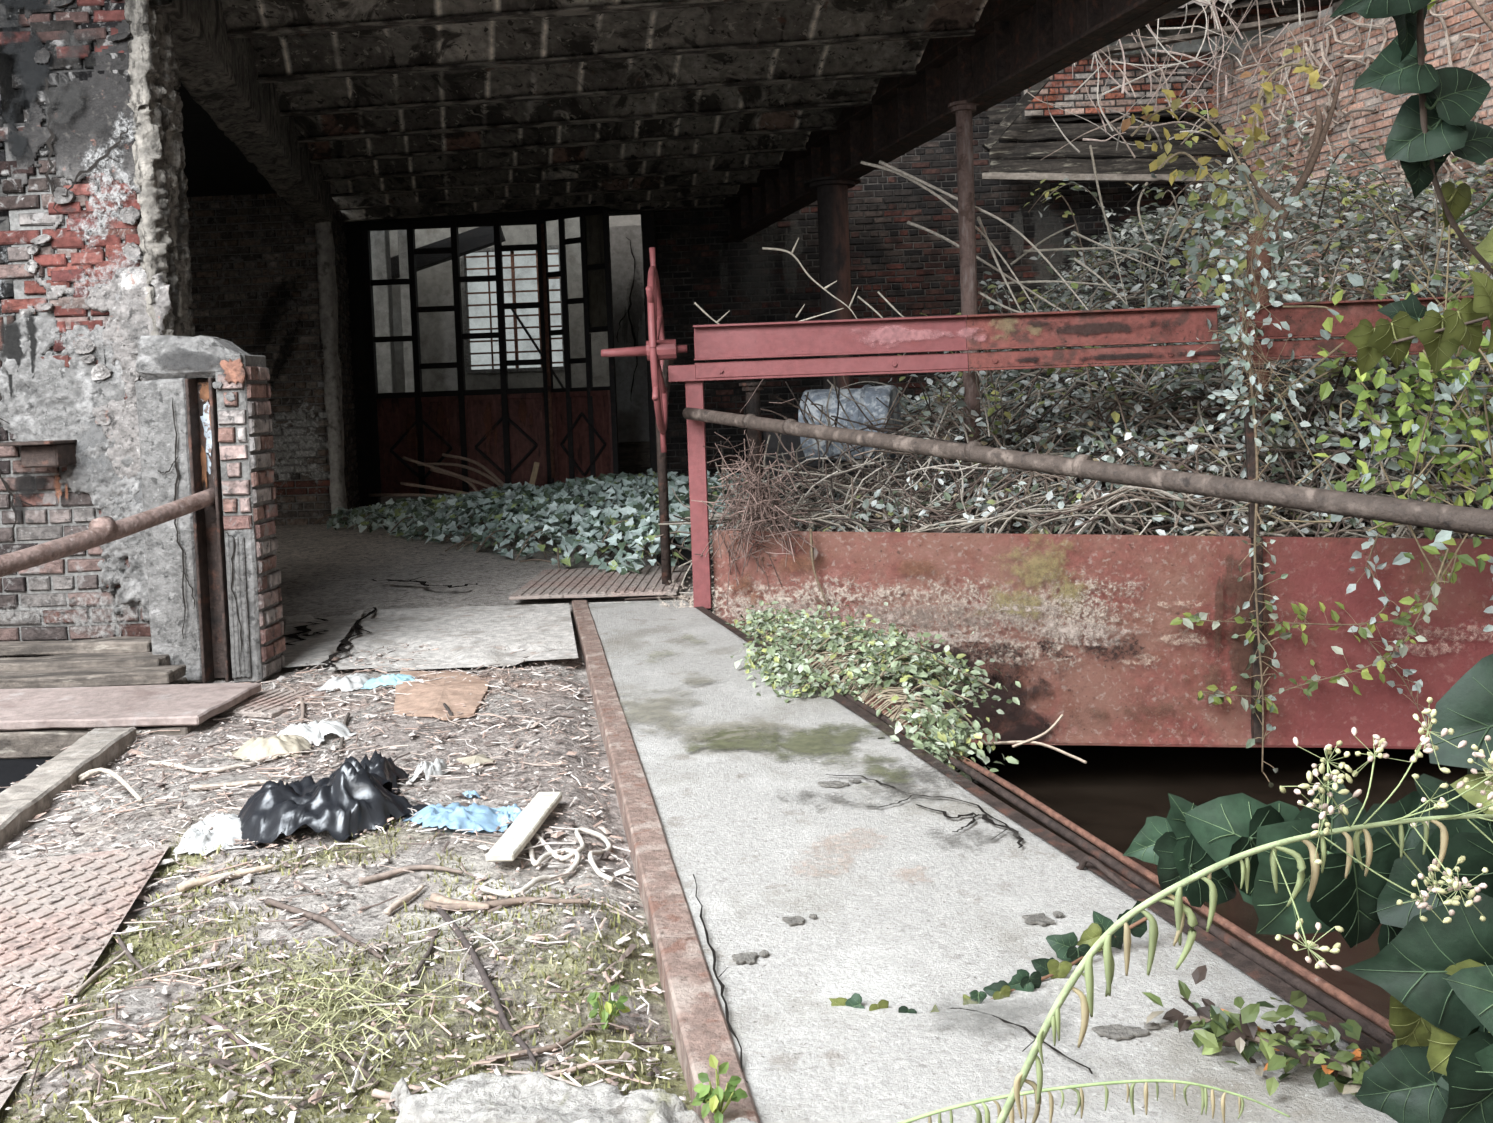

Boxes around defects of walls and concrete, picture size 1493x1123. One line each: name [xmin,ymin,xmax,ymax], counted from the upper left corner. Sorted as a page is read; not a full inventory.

flaking render [0,0,173,479]
rust [1080,353,1162,361]
crack [283,576,478,667]
rust [1213,556,1271,700]
rust [820,636,1144,744]
crack [826,774,1024,848]
crack [693,874,748,1083]